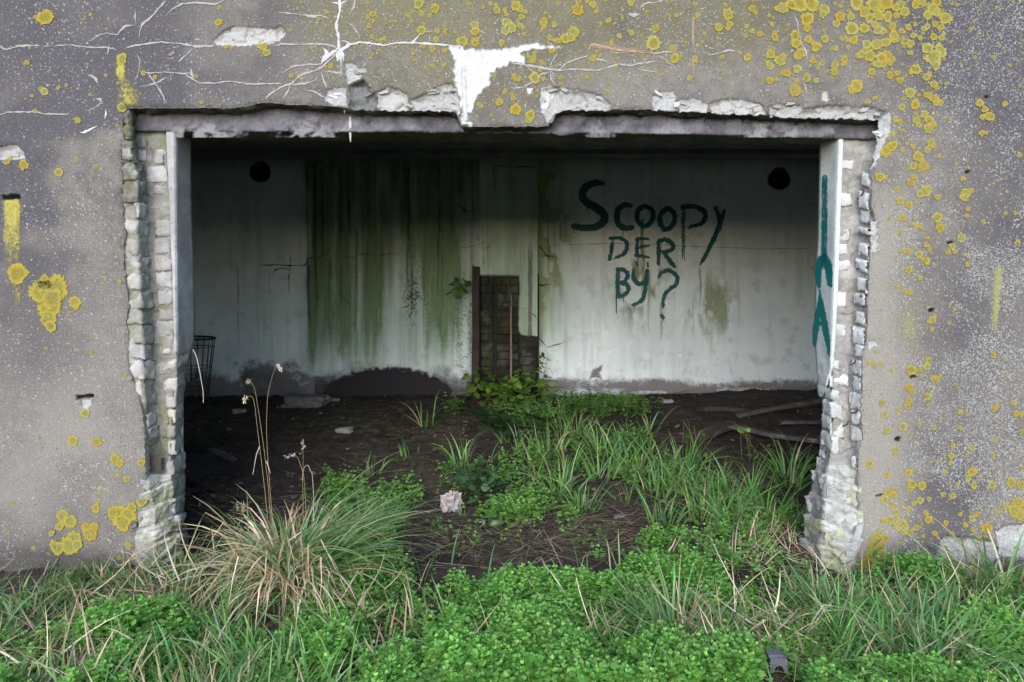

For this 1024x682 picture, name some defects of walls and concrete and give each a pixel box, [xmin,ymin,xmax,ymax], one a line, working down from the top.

crack [0,0,462,103]
spalling [214,27,286,47]
crack [0,75,107,133]
spalling [325,63,460,112]
spalling [542,87,611,123]
spalling [0,145,25,160]
water stain [307,161,473,363]
spalling [150,455,161,472]
spalling [840,521,864,574]
spalling [935,524,1024,570]